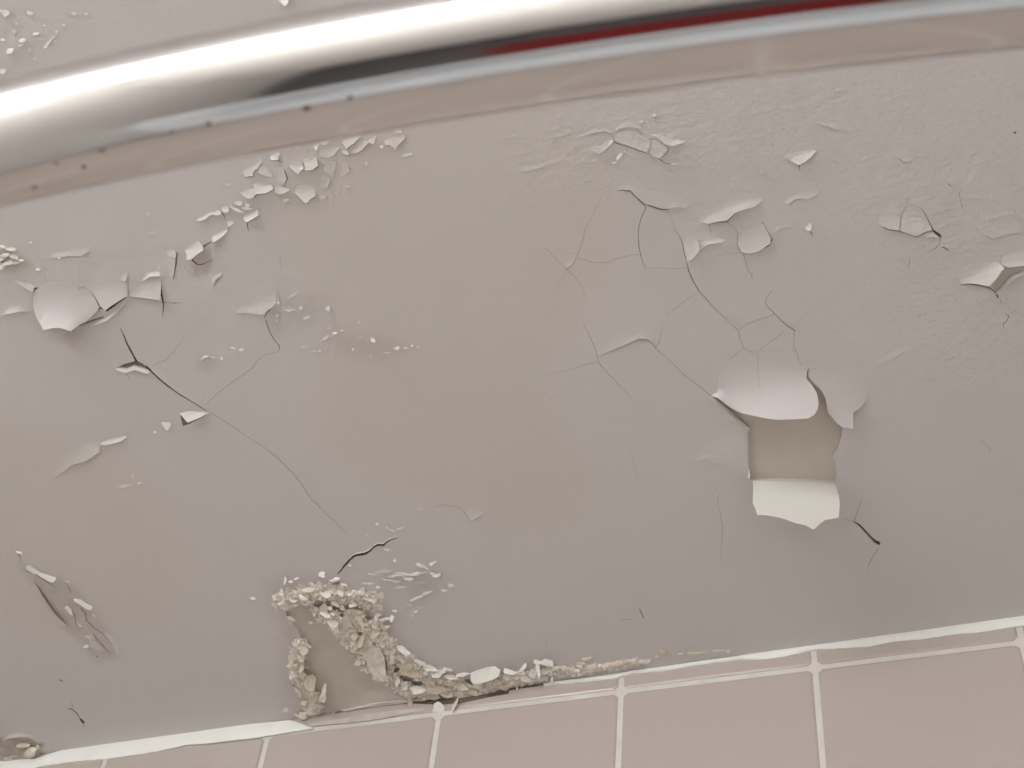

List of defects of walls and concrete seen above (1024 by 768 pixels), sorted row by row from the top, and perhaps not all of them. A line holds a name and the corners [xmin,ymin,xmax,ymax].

spalling [0,245,25,270]
peeling [0,273,128,331]
peeling [185,129,415,286]
crack [545,177,693,300]
peeling [683,187,819,279]
crack [878,198,964,274]
spalling [961,248,1024,328]
crack [551,315,712,397]
crack [115,290,486,574]
spalling [695,349,867,530]
crack [845,495,880,571]
spalling [270,558,730,720]